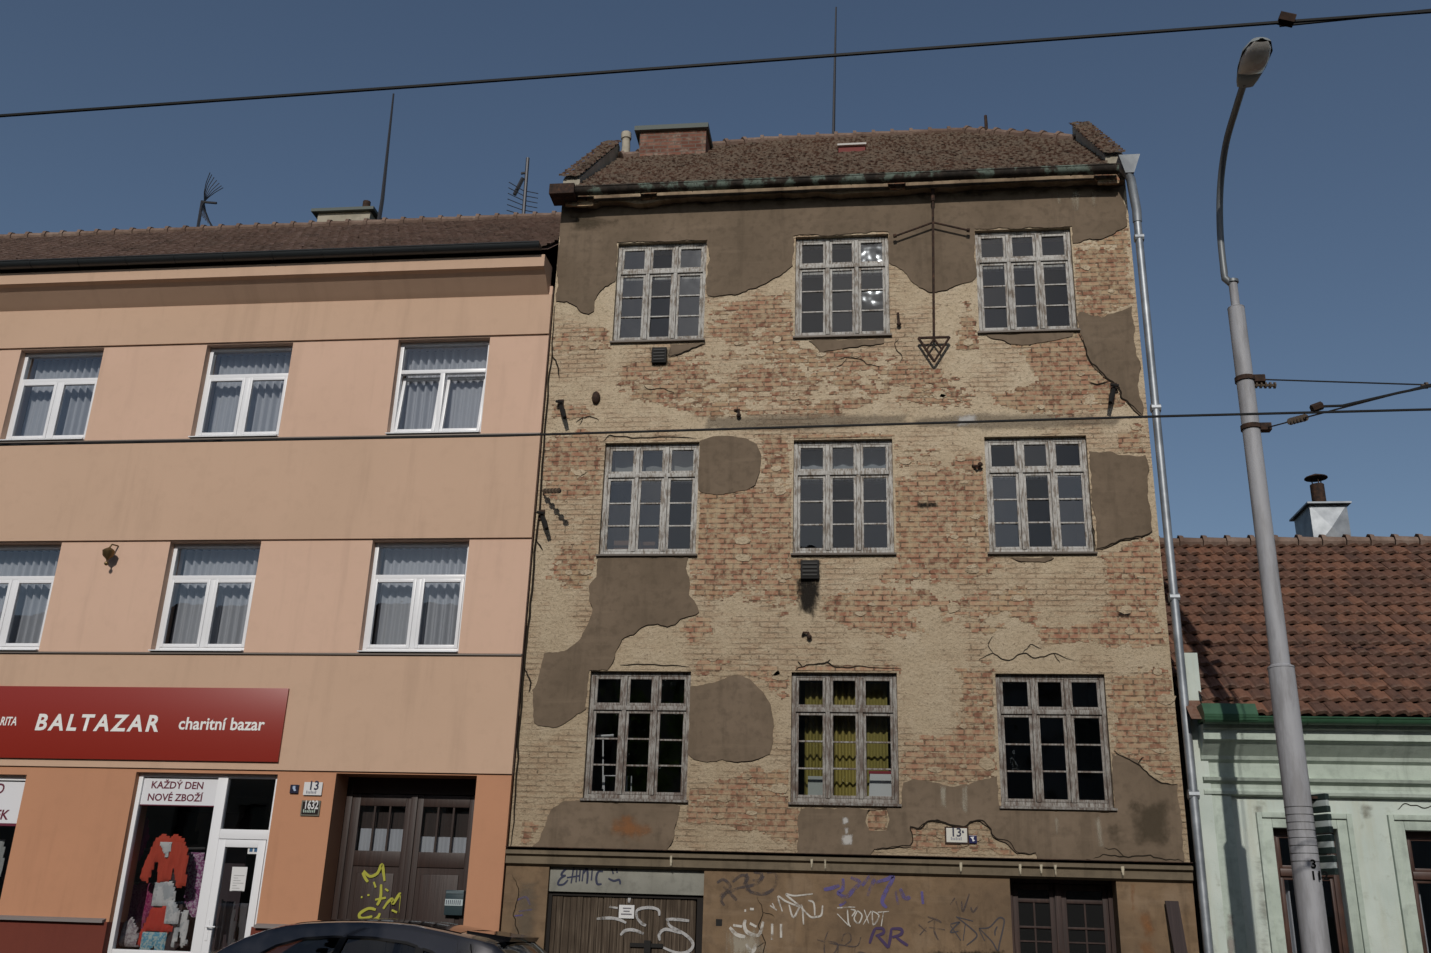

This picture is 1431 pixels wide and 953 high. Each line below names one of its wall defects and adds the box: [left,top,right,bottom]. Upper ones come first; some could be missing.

flaking render [521,174,1184,864]
crack [979,636,1072,662]
crack [878,819,1036,854]